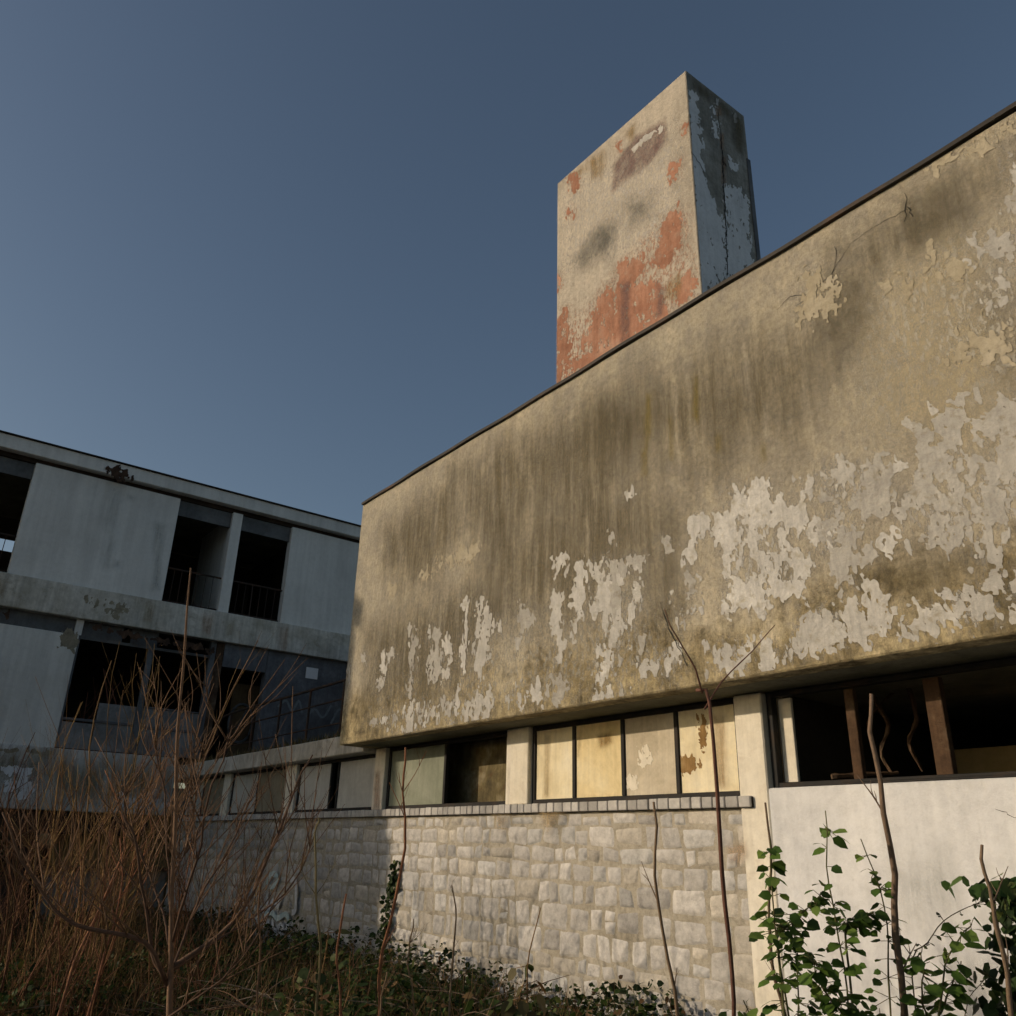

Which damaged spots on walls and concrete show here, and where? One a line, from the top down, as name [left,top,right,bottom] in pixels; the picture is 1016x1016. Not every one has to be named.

flaking render [926,115,1016,179]
peeling [999,152,1016,215]
peeling [557,90,754,383]
flaking render [794,265,847,333]
crack [777,194,913,310]
peeling [878,228,1016,316]
flaking render [942,321,1016,367]
damp [655,360,801,447]
peeling [369,387,1016,733]
peeling [0,745,52,801]